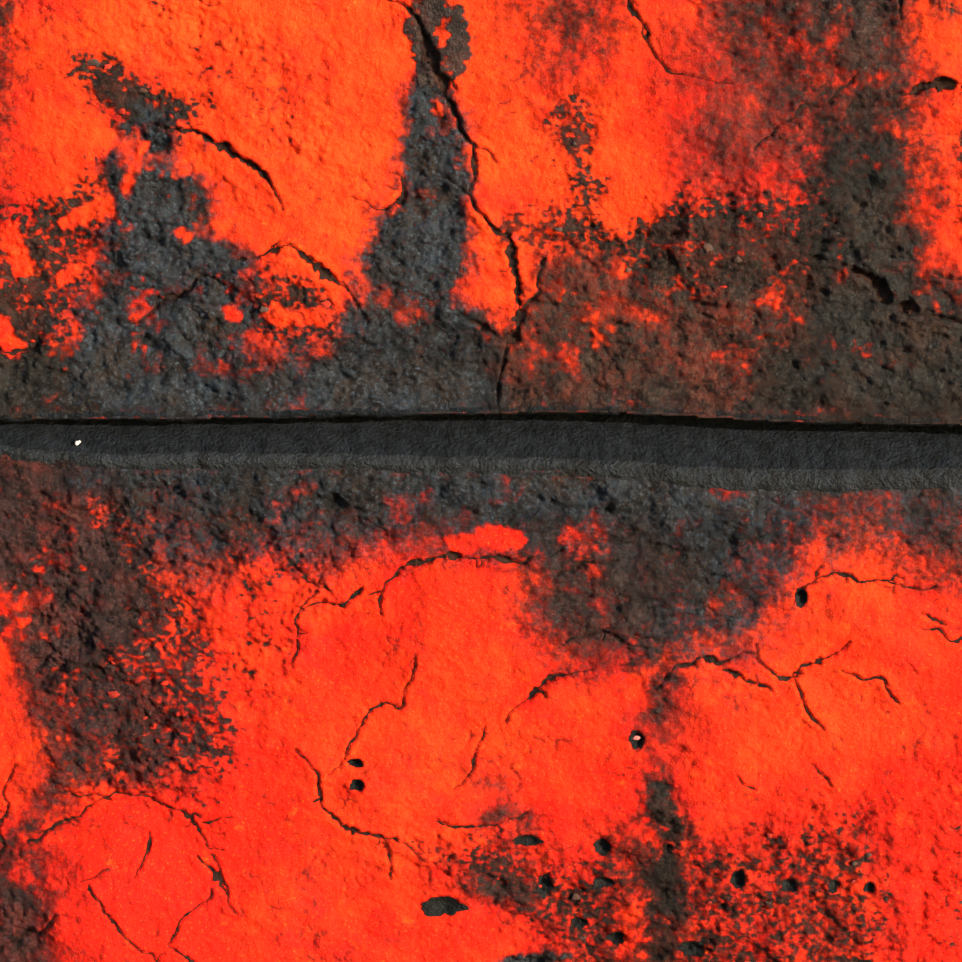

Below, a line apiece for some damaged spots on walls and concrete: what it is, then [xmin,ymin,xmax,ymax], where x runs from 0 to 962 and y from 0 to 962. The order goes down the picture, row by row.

leakage [813,0,911,191]
crack [0,763,237,962]
crack [294,665,425,881]
crack [287,550,617,664]
crack [437,812,528,832]
crack [453,669,594,790]
leakage [107,475,962,666]
crack [563,631,659,649]
crack [656,641,898,727]
crack [794,568,937,605]
crack [922,613,962,643]